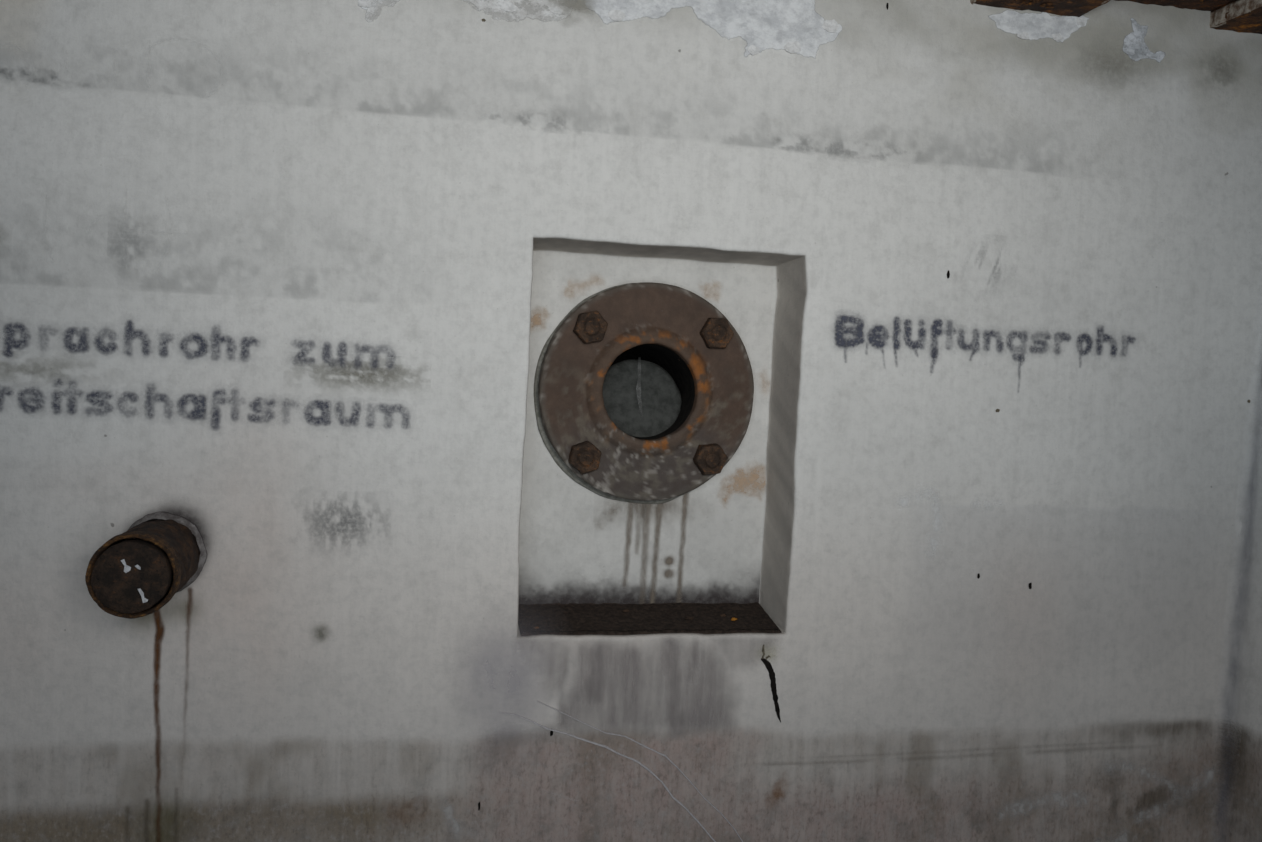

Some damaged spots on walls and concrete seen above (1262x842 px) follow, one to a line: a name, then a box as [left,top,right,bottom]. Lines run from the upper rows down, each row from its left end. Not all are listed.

peeling [464,0,842,58]
peeling [988,10,1089,42]
peeling [1123,18,1165,63]
rust [154,610,164,793]
crack [761,645,781,722]